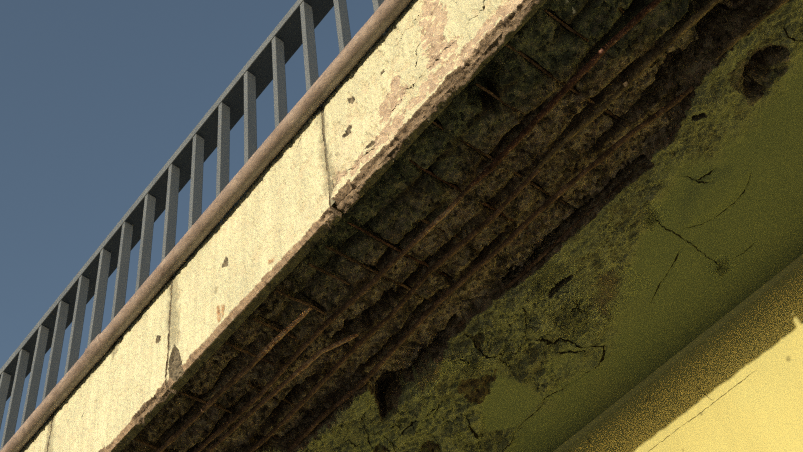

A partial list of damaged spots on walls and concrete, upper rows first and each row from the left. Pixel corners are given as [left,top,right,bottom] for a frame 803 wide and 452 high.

spalling [247,0,791,452]
crack [647,173,751,302]
spalling [132,381,171,425]
peeling [168,344,184,382]